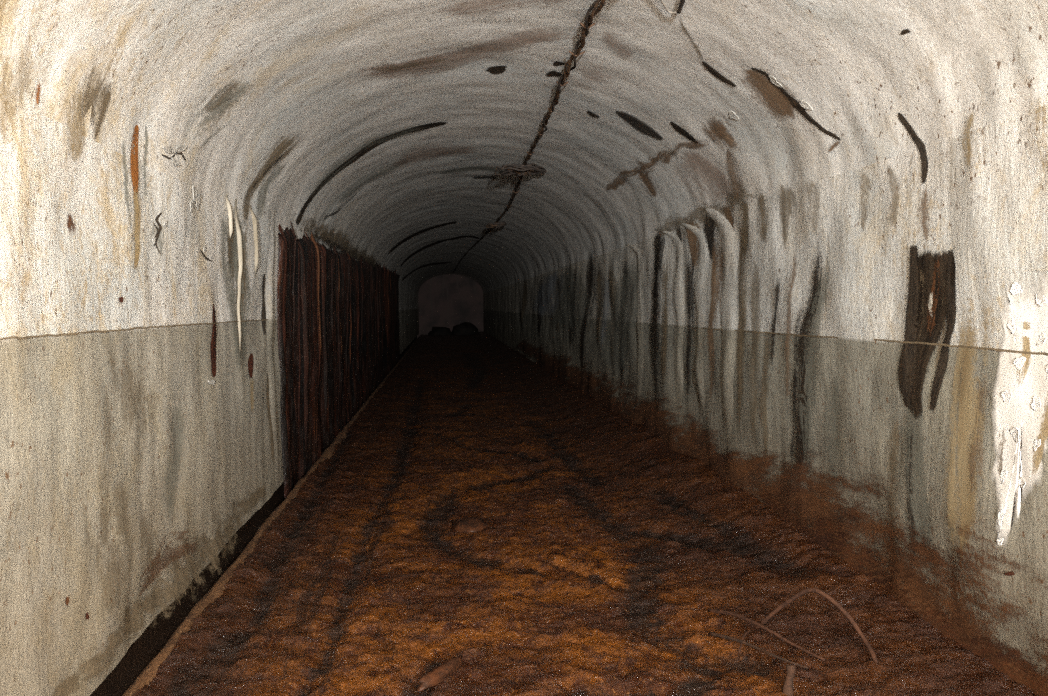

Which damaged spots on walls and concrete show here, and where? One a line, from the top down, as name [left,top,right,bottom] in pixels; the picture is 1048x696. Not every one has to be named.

rust [123,125,148,268]
rust [277,221,400,498]
damp [521,253,629,386]
damp [651,149,829,475]
rust [514,339,1048,696]
damp [889,245,990,578]
peeling [993,278,1048,545]